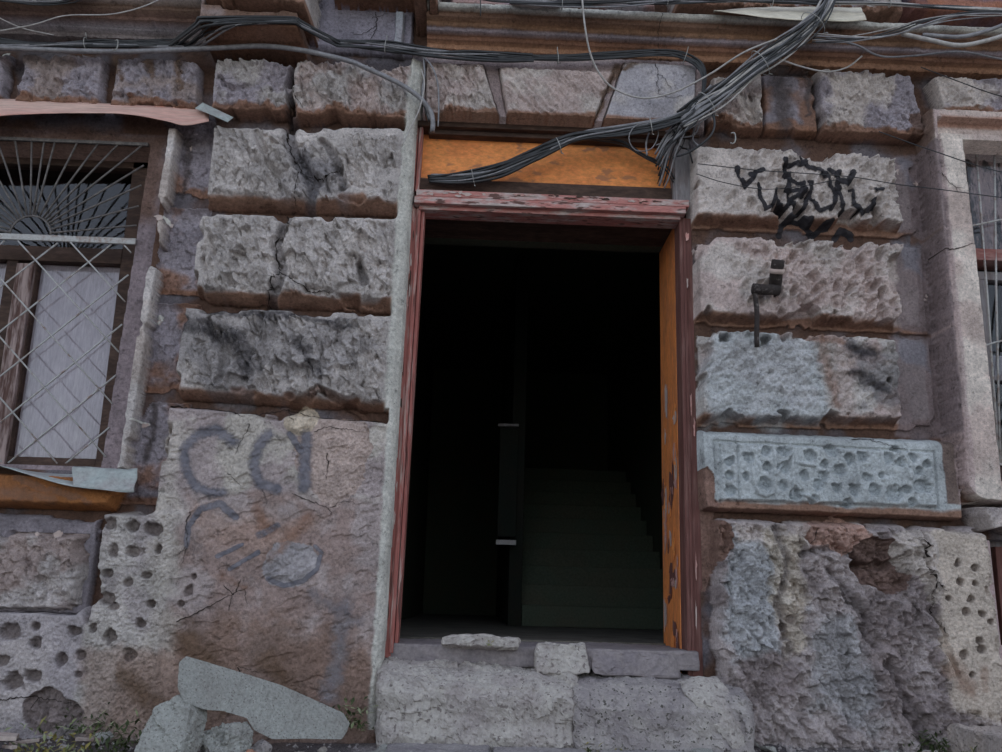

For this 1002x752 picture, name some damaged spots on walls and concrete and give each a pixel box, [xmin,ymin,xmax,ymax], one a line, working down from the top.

peeling [661,433,679,648]
spalling [695,466,736,592]
spalling [805,513,913,594]
spalling [22,685,85,736]